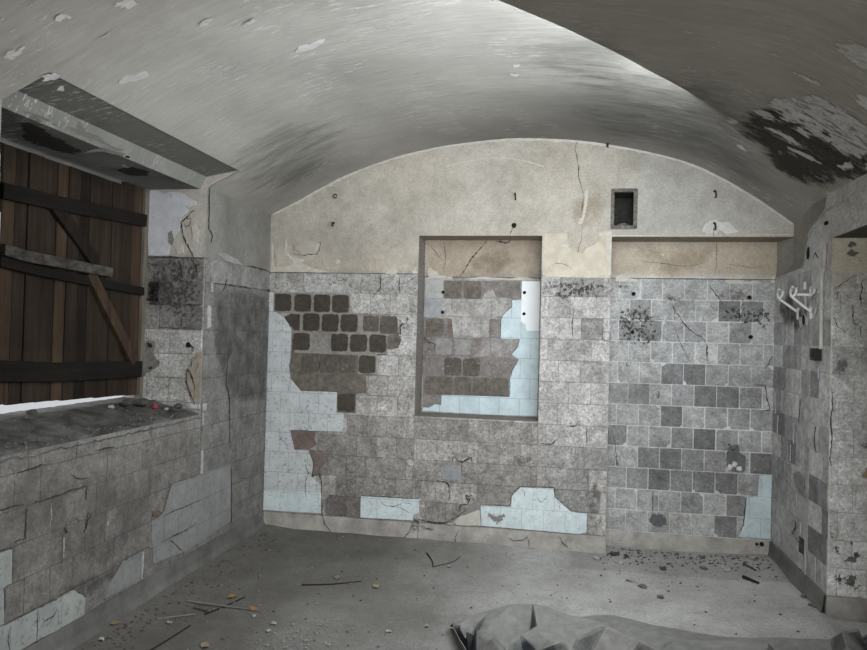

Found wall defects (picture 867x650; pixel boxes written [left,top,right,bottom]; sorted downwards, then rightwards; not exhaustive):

peeling [148,190,199,256]
crack [428,218,516,276]
spalling [271,138,794,416]
water stain [619,305,658,344]
spalling [263,292,401,513]
peeling [360,486,587,534]